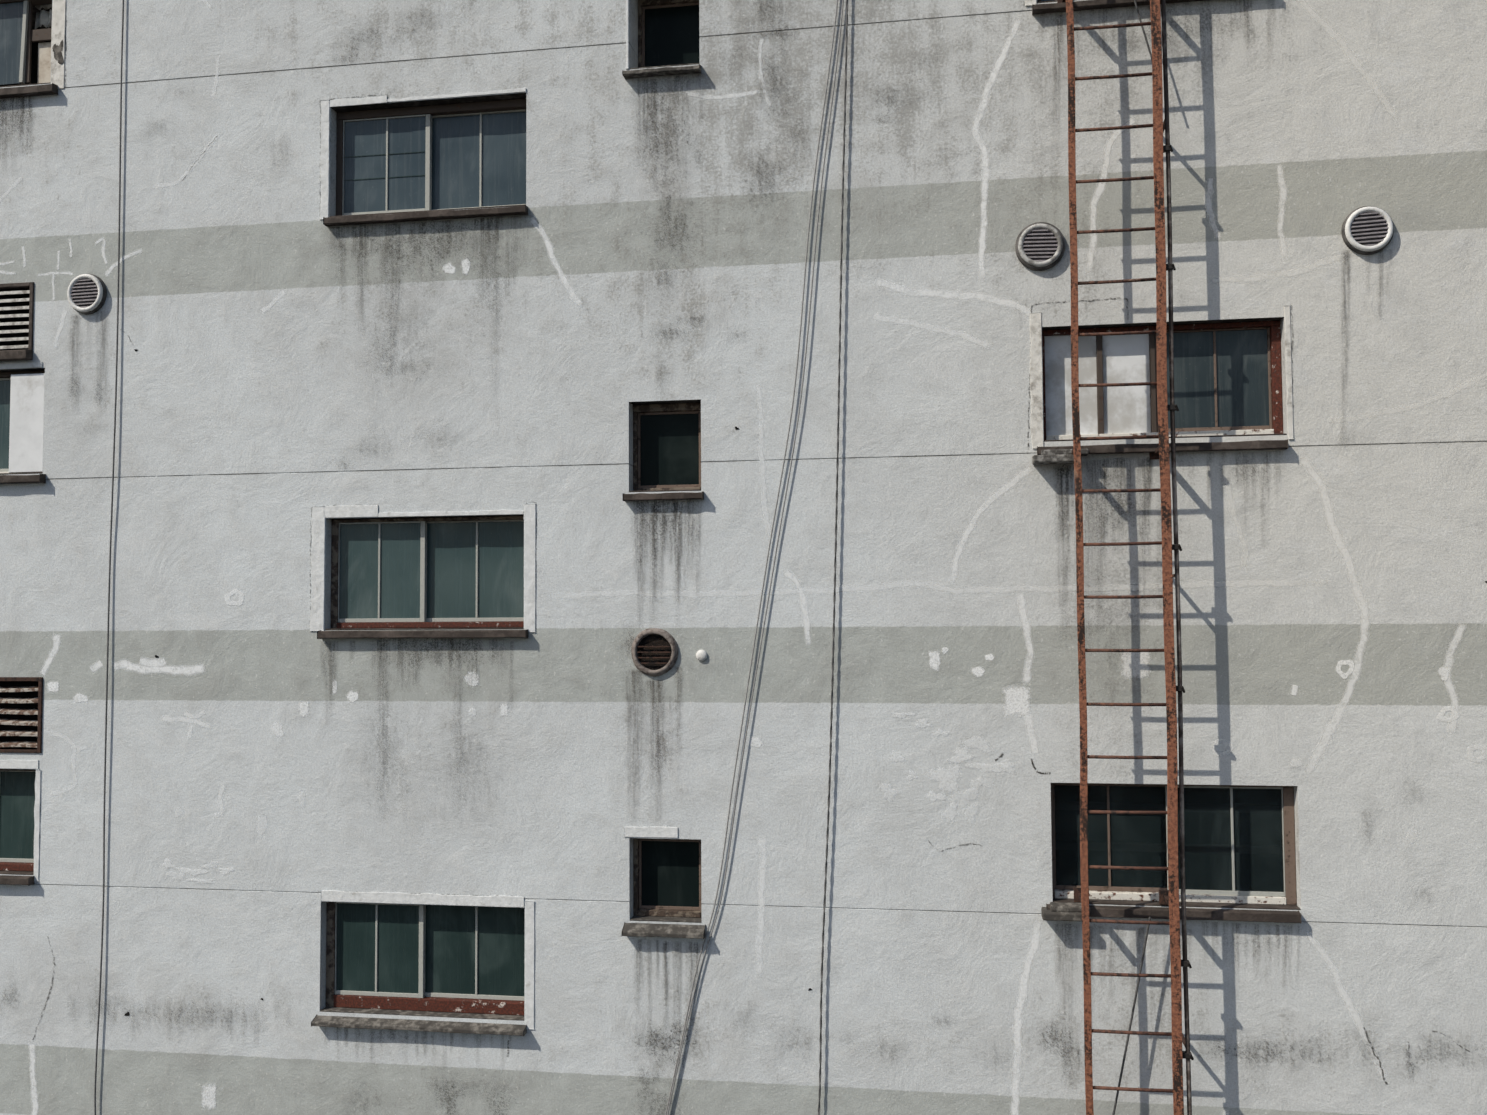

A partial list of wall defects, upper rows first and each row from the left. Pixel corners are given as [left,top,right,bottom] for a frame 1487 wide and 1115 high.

crack [29,943,55,1115]
crack [1308,933,1470,1085]